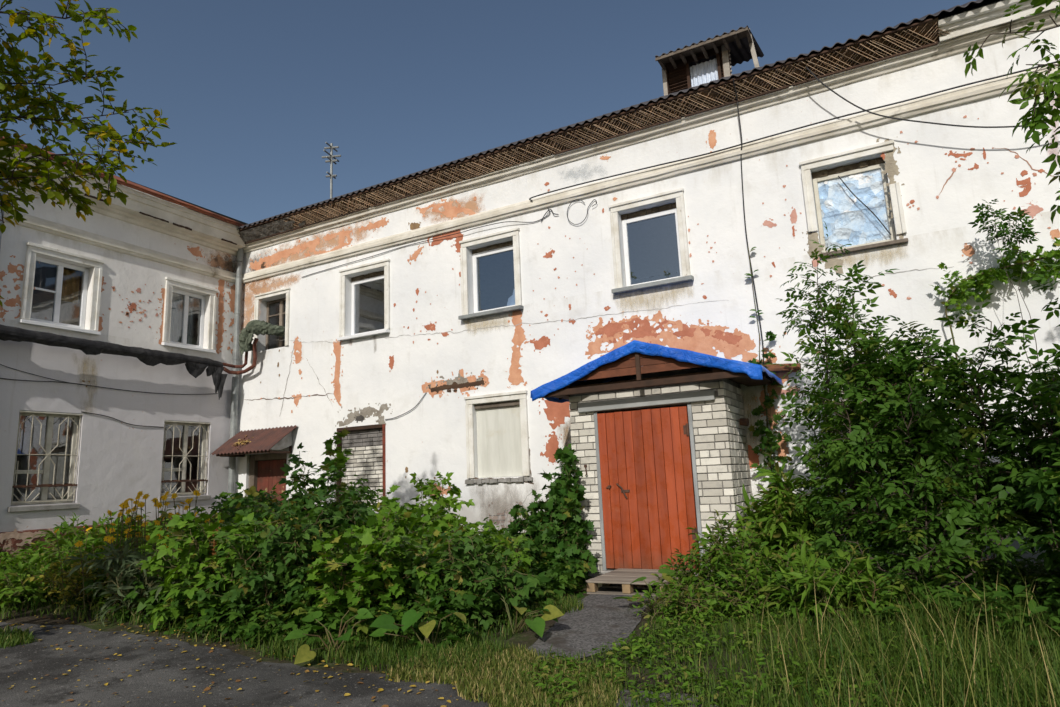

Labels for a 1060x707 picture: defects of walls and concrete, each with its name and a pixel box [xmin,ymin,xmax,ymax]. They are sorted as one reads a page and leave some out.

peeling [945,148,993,170]
peeling [1004,170,1044,220]
peeling [249,217,389,270]
peeling [407,196,478,265]
peeling [961,243,975,264]
peeling [0,255,24,322]
peeling [507,243,576,388]
spalling [331,339,393,428]
spalling [422,369,490,398]
crack [244,300,729,417]
peeling [585,306,800,469]
peeling [538,398,572,465]